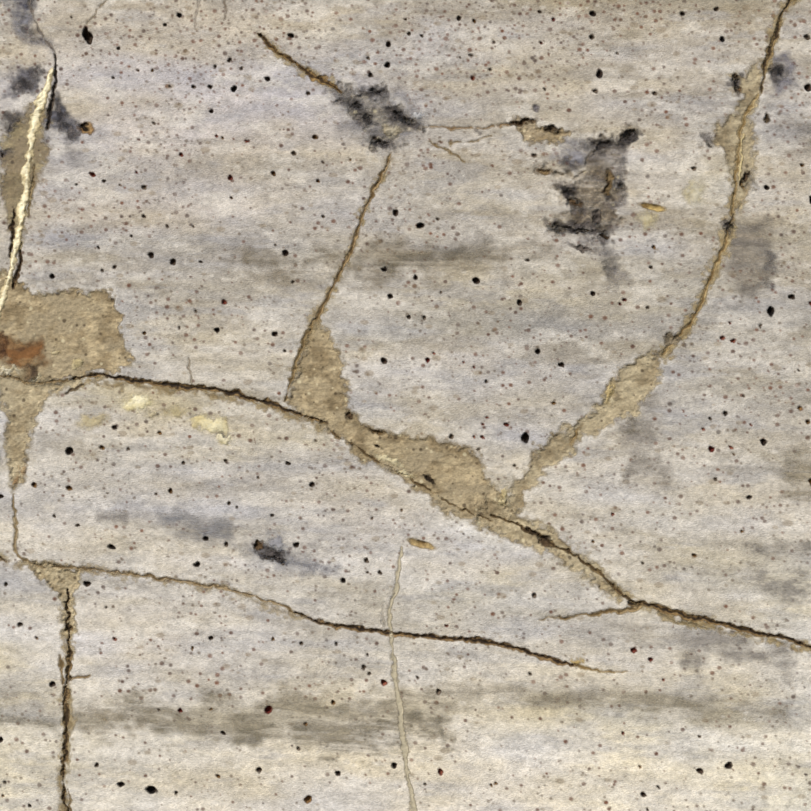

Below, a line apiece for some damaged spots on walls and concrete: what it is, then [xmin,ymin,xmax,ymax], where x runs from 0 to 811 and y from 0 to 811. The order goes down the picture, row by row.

crack [0,0,57,316]
crack [257,33,342,93]
crack [429,121,514,162]
crack [660,0,797,364]
spalling [0,269,135,490]
peeling [122,395,156,418]
crack [0,153,391,463]
peeling [170,407,230,444]
crack [0,495,628,811]
spalling [284,322,668,598]
crack [397,473,811,652]